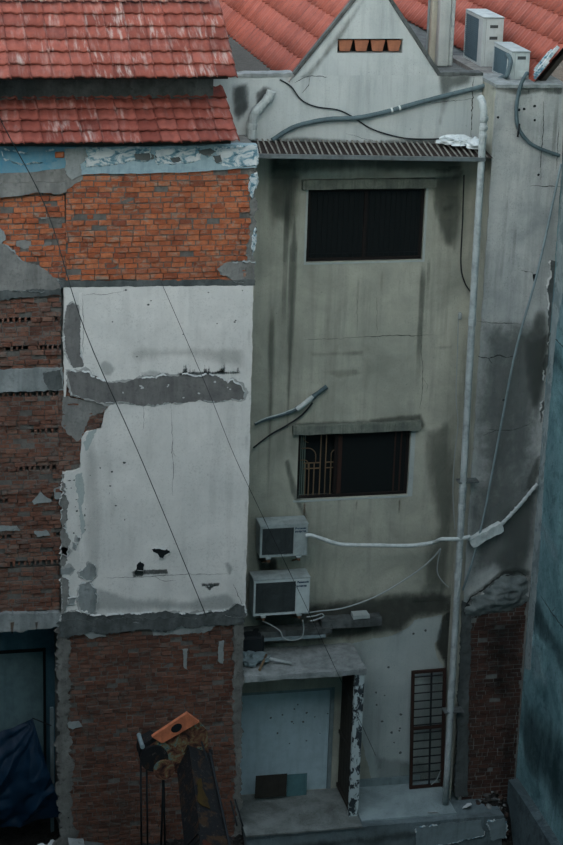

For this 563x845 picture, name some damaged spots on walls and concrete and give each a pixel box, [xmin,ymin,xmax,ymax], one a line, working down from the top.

peeling [1,145,259,198]
flaking render [0,228,62,301]
flaking render [217,228,257,291]
flaking render [43,301,249,451]
crack [308,301,428,404]
peeling [352,615,443,782]